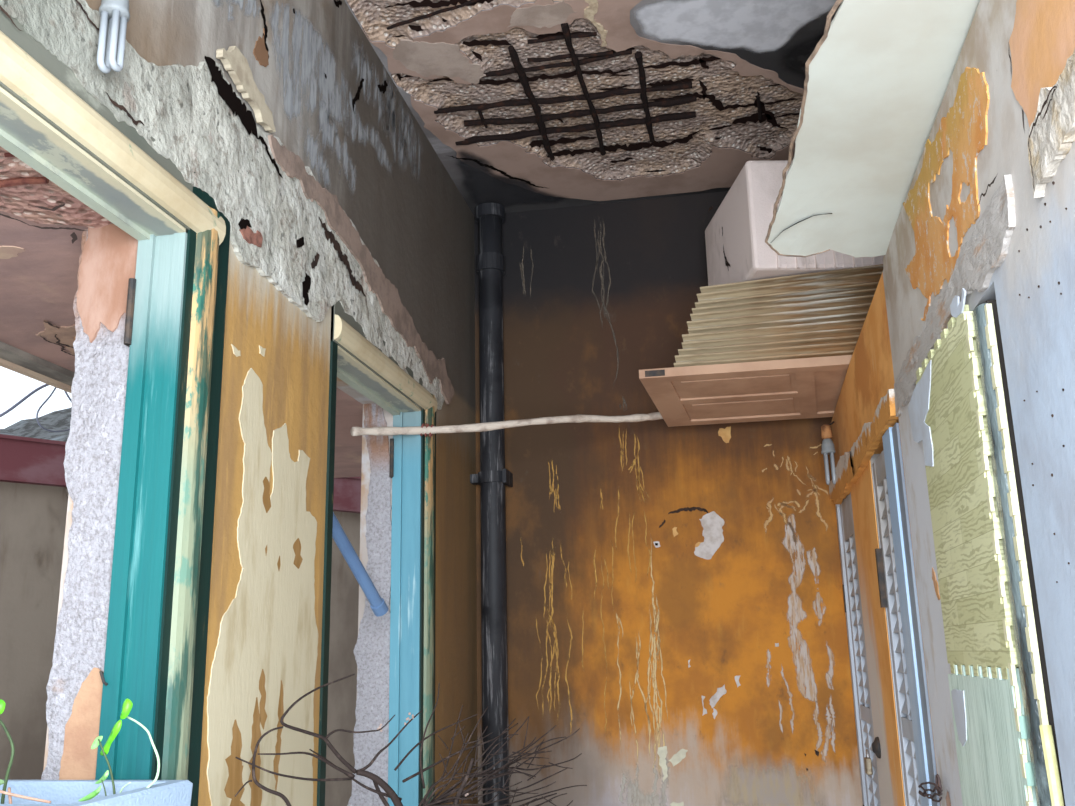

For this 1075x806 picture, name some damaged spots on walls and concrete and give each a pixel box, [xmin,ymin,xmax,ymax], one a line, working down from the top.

peeling [0,0,454,410]
spalling [346,0,804,201]
peeling [903,67,990,321]
spalling [0,146,138,780]
peeling [207,368,319,806]
spalling [347,403,392,806]
water stain [548,460,560,509]
water stain [536,541,584,734]
water stain [593,429,669,806]
water stain [762,444,828,541]
peeling [766,514,836,763]
water stain [725,765,820,806]